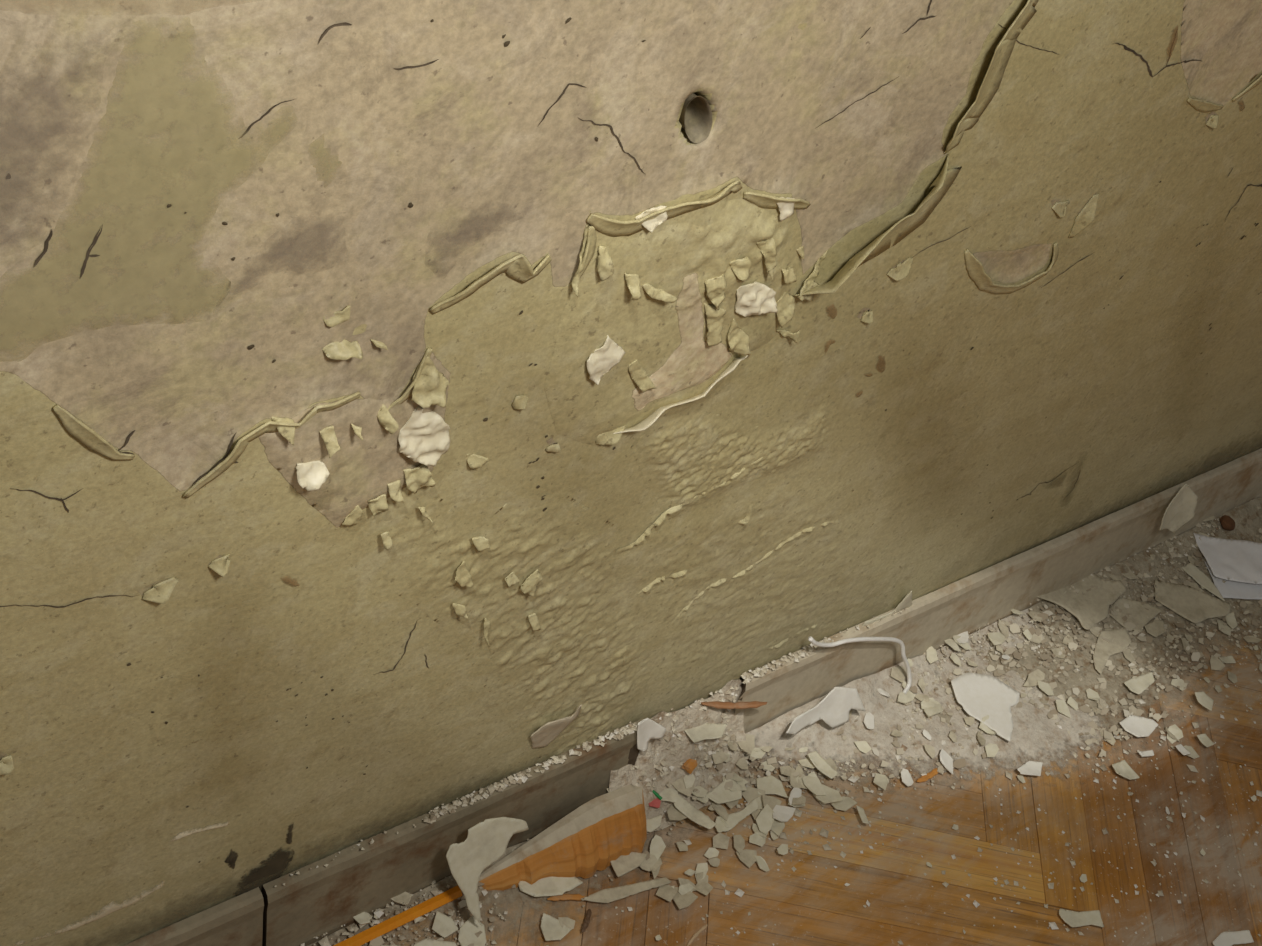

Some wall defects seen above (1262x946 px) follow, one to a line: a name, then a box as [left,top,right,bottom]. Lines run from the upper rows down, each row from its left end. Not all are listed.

peeling [1181,0,1262,129]
crack [1225,169,1262,220]
peeling [964,193,1099,294]
peeling [0,0,1039,528]
peeling [381,531,393,550]
peeling [472,536,490,552]
peeling [208,554,231,578]
peeling [454,560,474,588]
peeling [505,569,543,597]
crack [0,595,137,608]